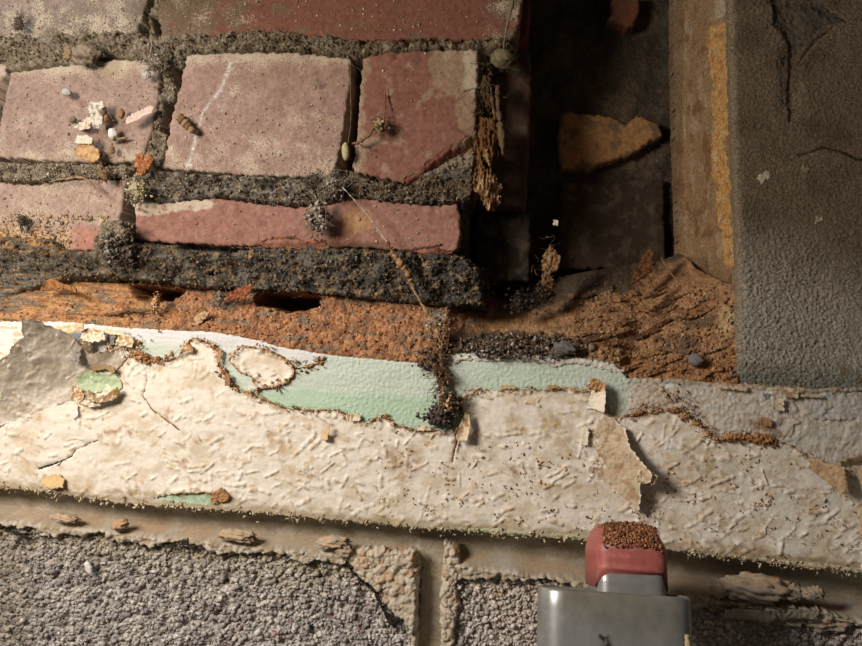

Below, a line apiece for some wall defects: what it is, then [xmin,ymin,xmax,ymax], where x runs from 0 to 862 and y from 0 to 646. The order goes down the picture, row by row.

crack [799,147,862,161]
peeling [0,324,23,359]
peeling [56,323,134,353]
peeling [70,364,122,419]
peeling [144,332,862,468]